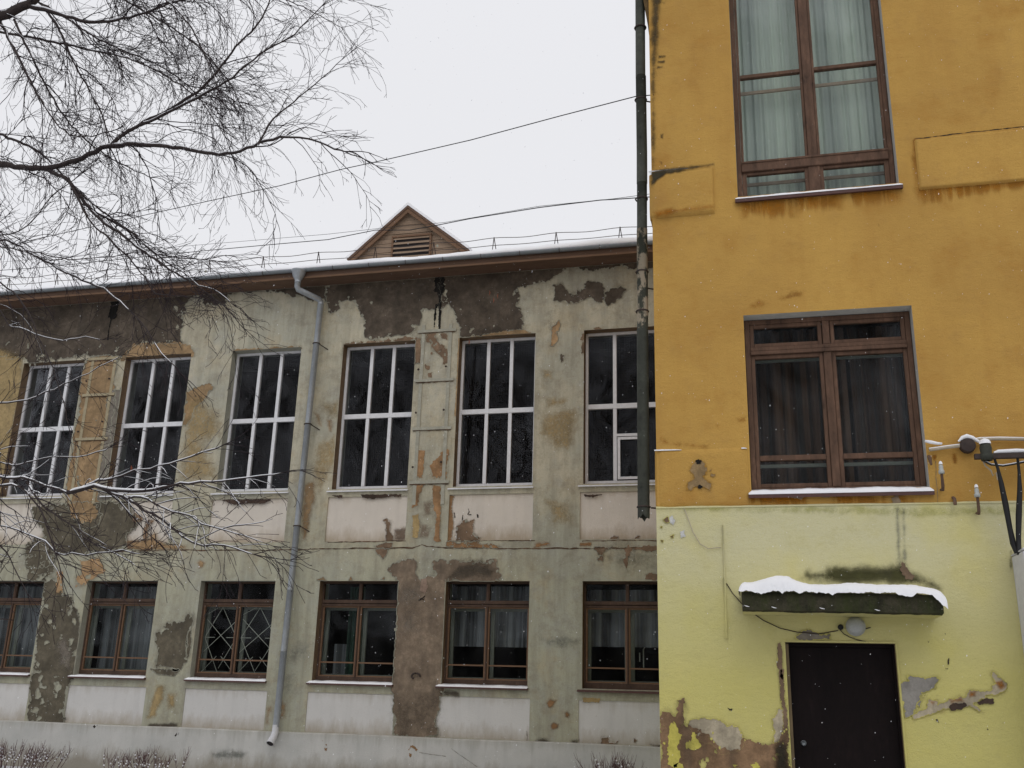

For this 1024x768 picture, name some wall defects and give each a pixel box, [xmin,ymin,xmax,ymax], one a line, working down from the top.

damp [651,164,713,184]
damp [433,277,445,329]
peeling [0,261,653,737]
peeling [594,515,686,568]
spalling [660,643,791,768]
peeling [898,658,1008,723]